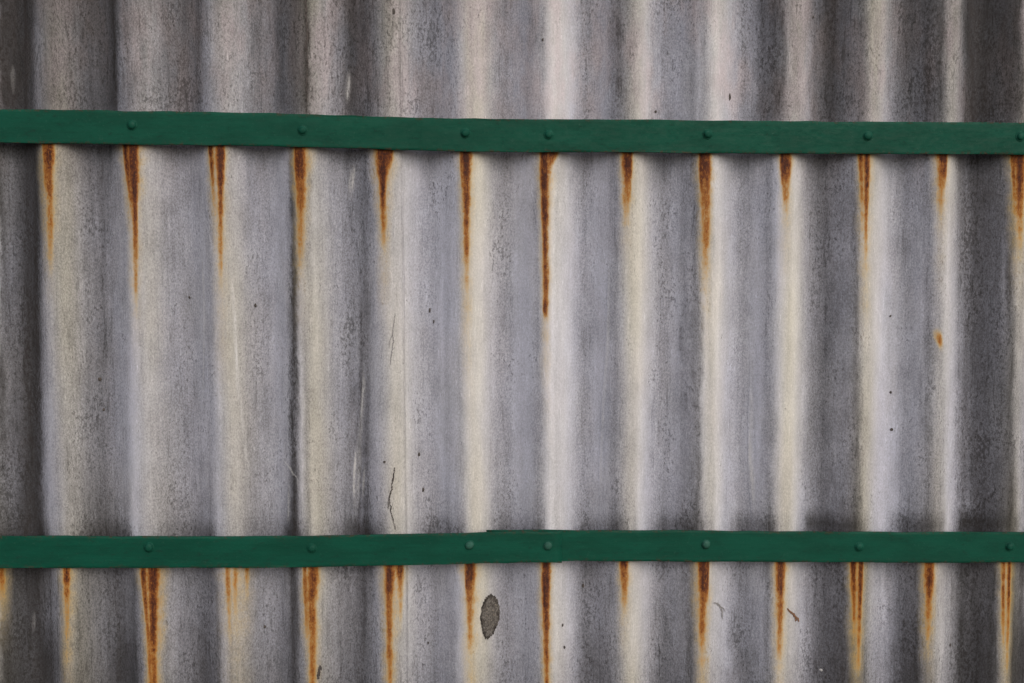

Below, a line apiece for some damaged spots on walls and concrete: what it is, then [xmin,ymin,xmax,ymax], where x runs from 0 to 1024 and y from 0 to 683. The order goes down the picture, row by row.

rust [35,144,67,320]
rust [112,145,157,371]
rust [285,147,321,360]
rust [528,152,563,464]
rust [688,153,720,376]
rust [850,154,879,360]
rust [132,568,176,683]
rust [296,567,328,683]
rust [453,563,486,683]
spalling [480,593,500,640]
rust [533,562,558,683]
rust [840,562,870,683]